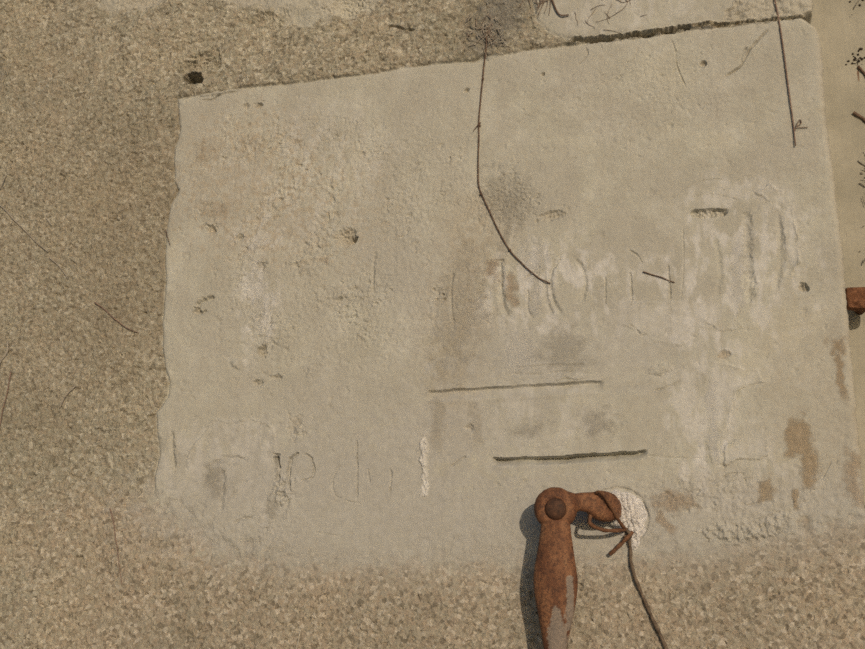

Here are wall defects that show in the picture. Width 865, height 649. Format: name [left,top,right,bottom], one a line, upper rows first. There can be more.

corrosion [785,420,817,507]